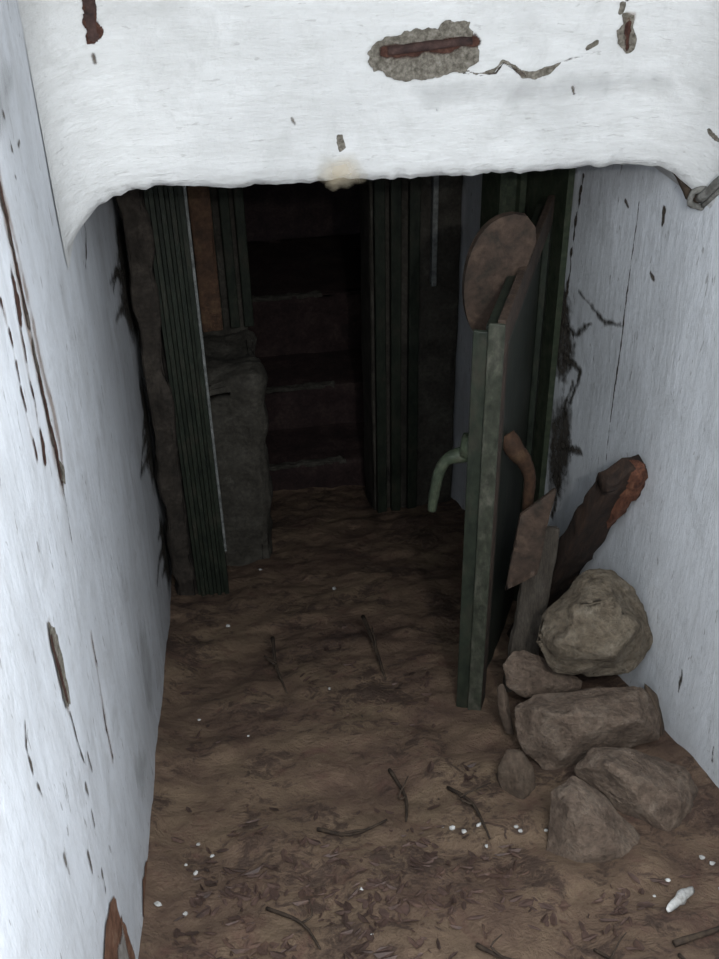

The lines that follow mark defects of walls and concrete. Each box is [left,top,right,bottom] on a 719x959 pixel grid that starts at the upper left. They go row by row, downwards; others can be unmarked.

spalling [82,0,104,64]
spalling [367,20,481,82]
crack [463,40,599,80]
spalling [617,0,637,54]
spalling [48,622,71,708]
peeling [104,896,135,959]